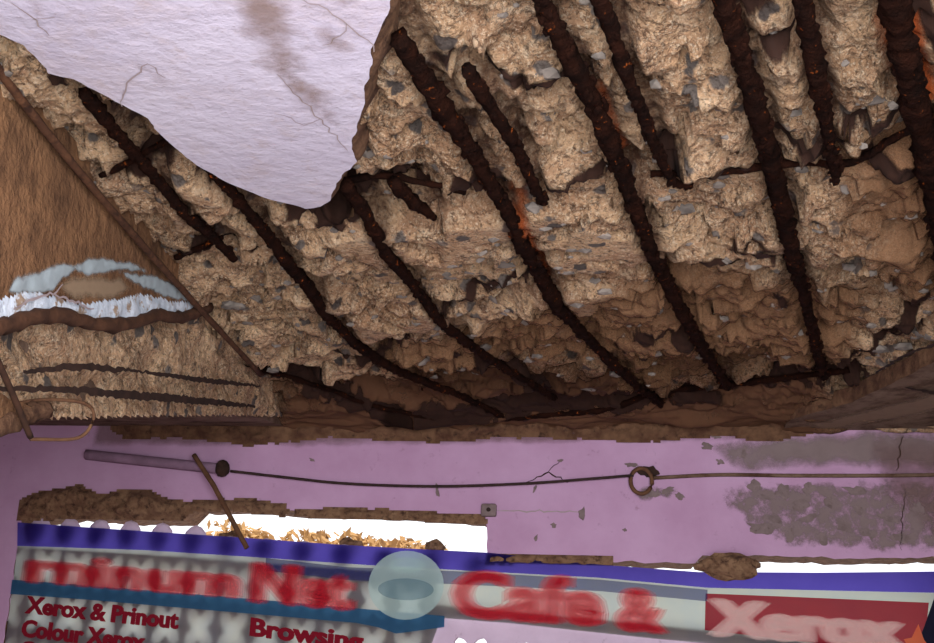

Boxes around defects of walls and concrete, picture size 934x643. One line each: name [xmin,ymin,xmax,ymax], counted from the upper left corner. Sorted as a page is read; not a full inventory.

rust [912,11,934,101]
crack [648,129,681,180]
crack [703,162,755,181]
crack [774,101,915,185]
spalling [0,0,934,469]
rust [516,188,549,268]
crack [440,251,538,319]
crack [0,289,934,430]
spalling [16,484,488,524]
crack [497,507,576,515]
crack [528,462,568,483]
peeling [638,487,684,500]